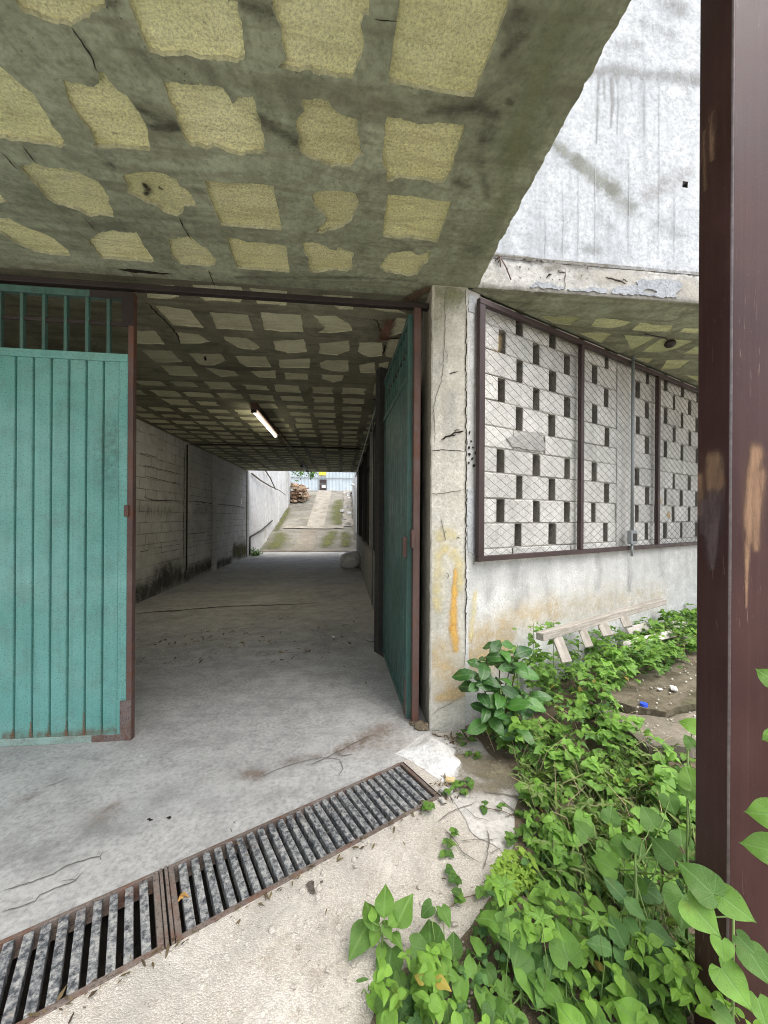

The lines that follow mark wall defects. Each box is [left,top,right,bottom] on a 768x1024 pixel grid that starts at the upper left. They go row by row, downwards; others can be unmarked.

crack [72,28,97,71]
peeling [129,0,245,58]
peeling [65,72,150,147]
peeling [165,81,264,152]
peeling [296,98,361,163]
damp [593,65,700,124]
peeling [124,171,195,214]
peeling [206,181,281,228]
damp [573,157,634,209]
crack [432,290,468,663]
damp [135,558,231,604]
corrosion [432,569,458,674]